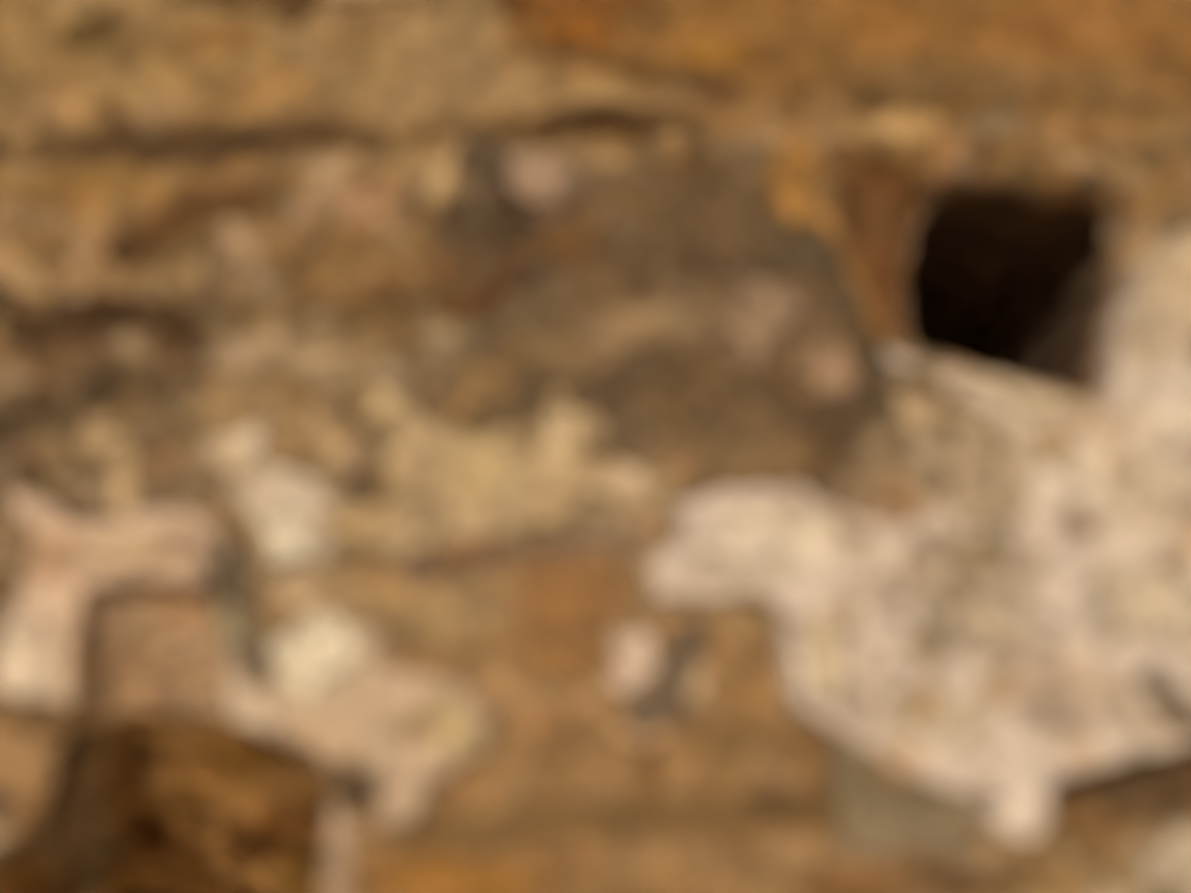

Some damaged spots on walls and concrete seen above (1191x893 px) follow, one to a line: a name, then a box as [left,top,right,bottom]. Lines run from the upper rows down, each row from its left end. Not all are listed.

spalling [0,240,52,301]
spalling [424,151,458,210]
peeling [0,419,224,713]
peeling [199,230,1191,842]